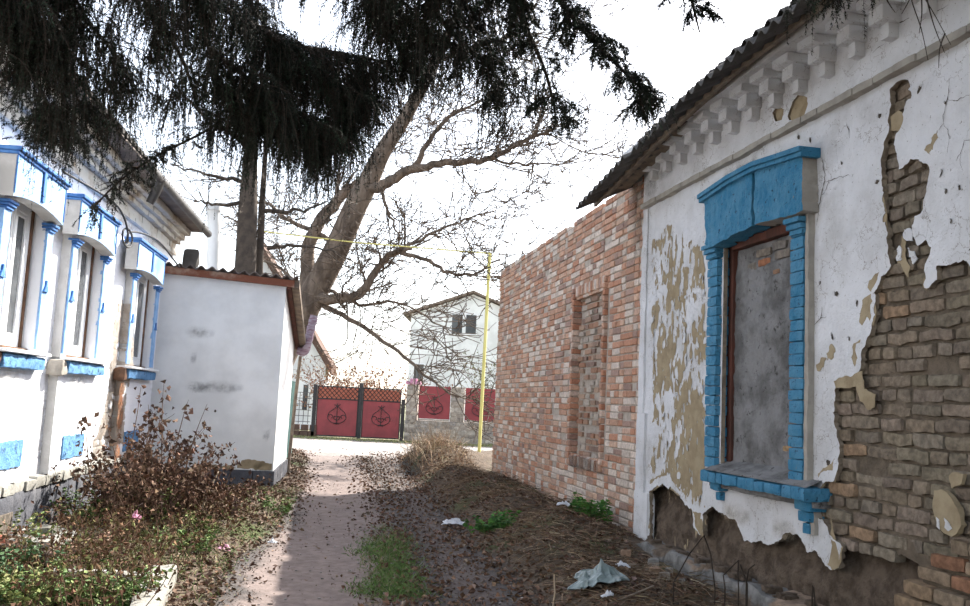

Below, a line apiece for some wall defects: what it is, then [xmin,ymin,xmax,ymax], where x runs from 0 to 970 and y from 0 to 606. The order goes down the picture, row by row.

peeling [92,300,134,461]
spalling [646,80,970,606]